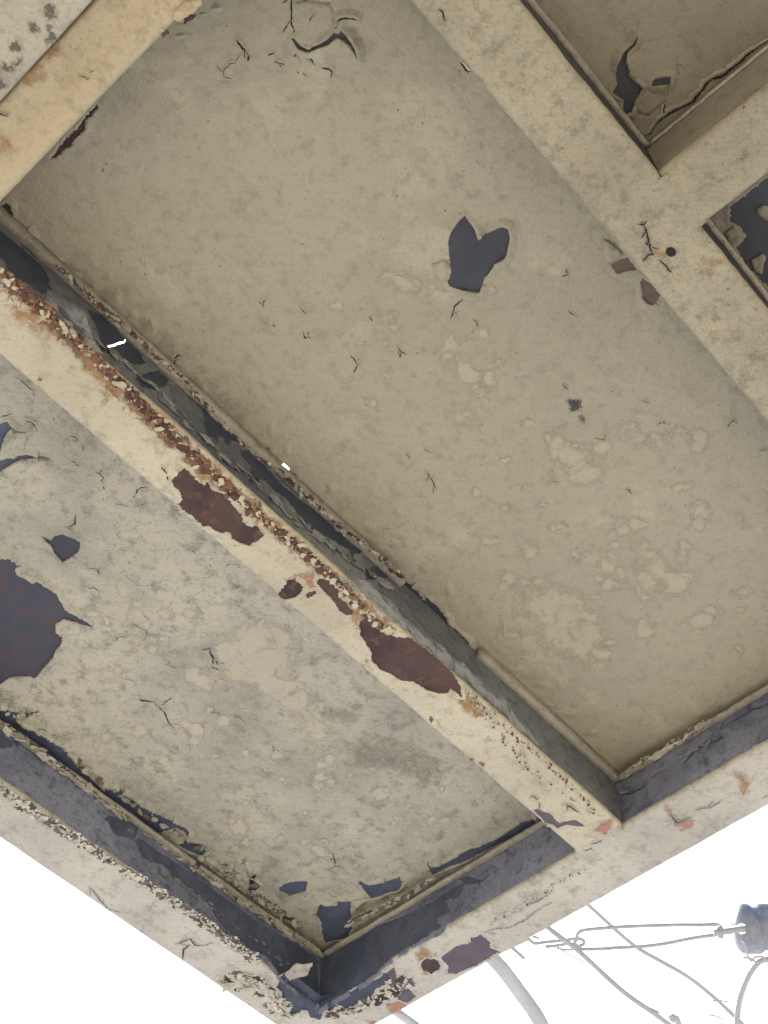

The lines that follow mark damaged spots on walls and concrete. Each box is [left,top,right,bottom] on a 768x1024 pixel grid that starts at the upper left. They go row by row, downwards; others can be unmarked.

peeling [43,99,104,166]
crack [216,0,336,79]
peeling [606,25,680,121]
crack [645,38,768,136]
peeling [432,209,518,300]
peeling [722,172,768,292]
corrosion [0,276,396,630]
peeling [0,231,478,700]
water stain [545,422,708,485]
water stain [496,517,700,669]
peeling [0,551,593,1021]
peeling [616,718,713,781]